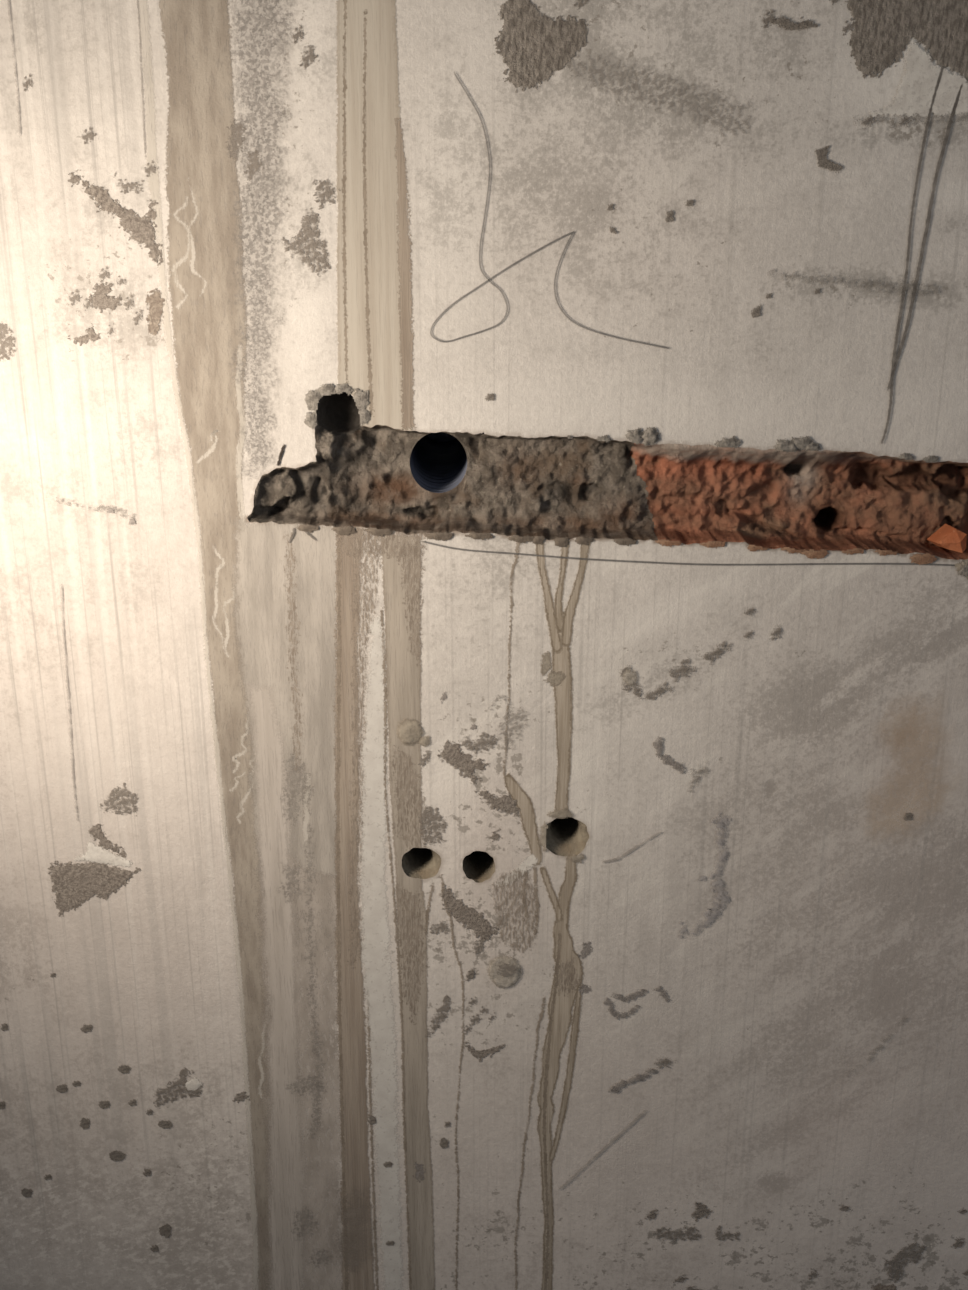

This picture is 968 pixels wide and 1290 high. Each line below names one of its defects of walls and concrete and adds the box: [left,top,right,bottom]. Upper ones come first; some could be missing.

peeling [494,0,750,136]
peeling [829,0,968,83]
peeling [68,161,163,266]
peeling [0,324,16,360]
peeling [68,267,165,346]
peeling [304,383,370,429]
flaking render [597,427,968,577]
damp [137,0,465,1290]
peeling [620,608,756,700]
peeling [418,696,526,819]
peeling [48,783,140,917]
peeling [645,1202,740,1243]